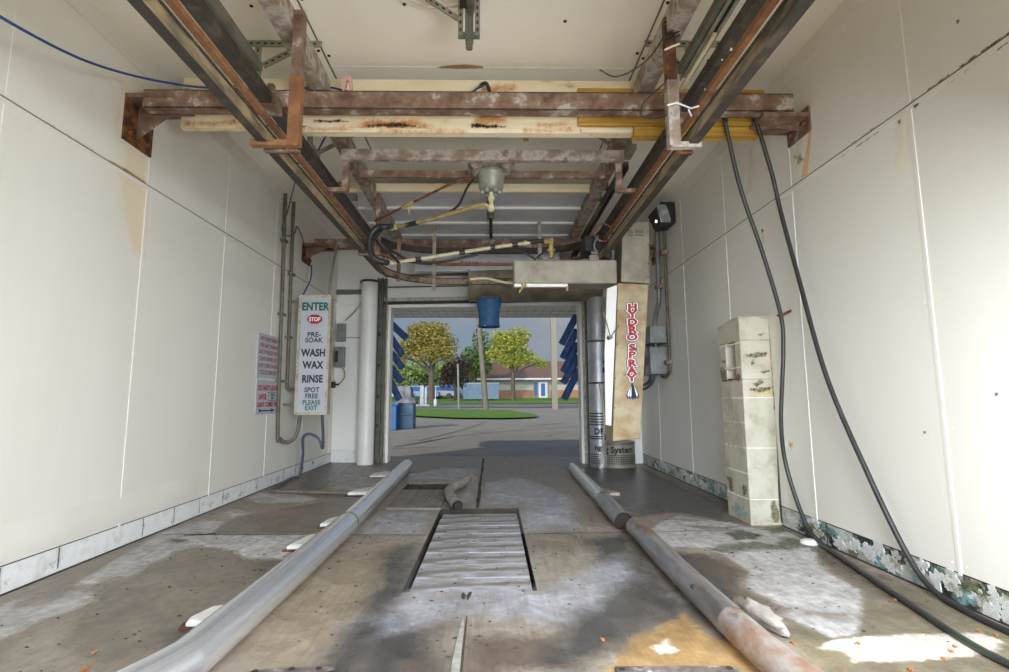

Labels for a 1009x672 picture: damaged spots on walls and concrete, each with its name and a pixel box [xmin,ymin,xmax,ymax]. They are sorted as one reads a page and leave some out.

water stain [0,463,393,662]
peeling [787,516,1009,624]